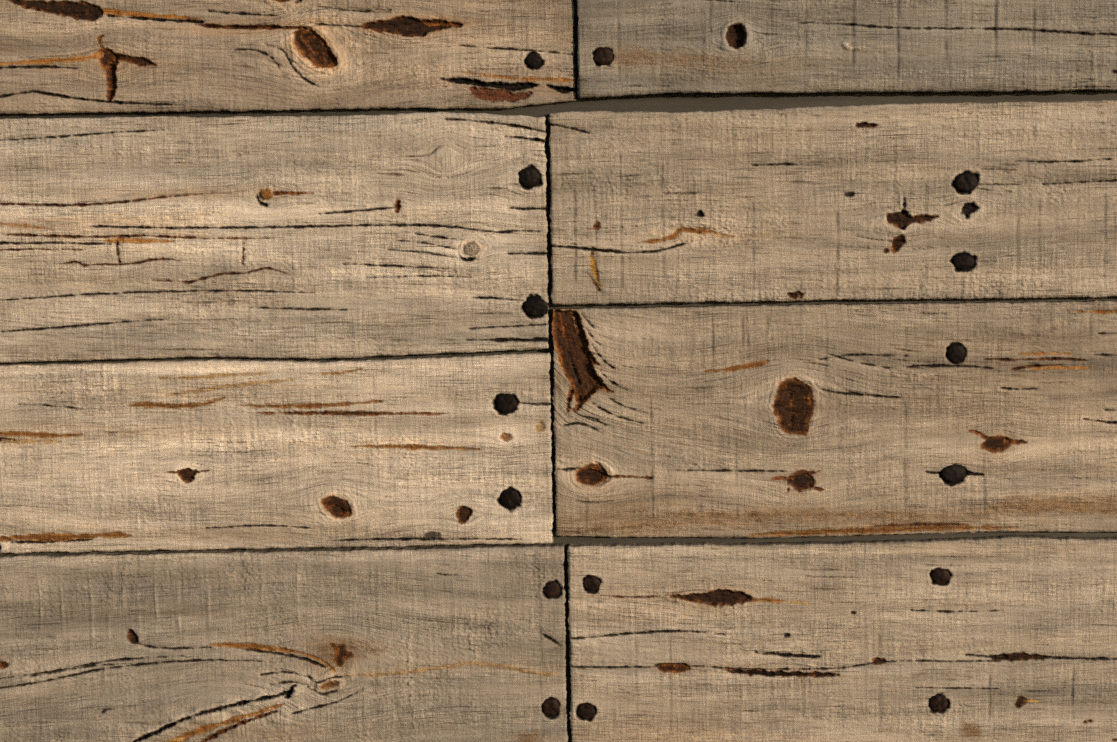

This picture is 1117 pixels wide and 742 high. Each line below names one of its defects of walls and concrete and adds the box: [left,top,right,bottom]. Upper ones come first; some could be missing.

crack [0,65,172,140]
crack [519,314,642,432]
crack [0,642,357,742]